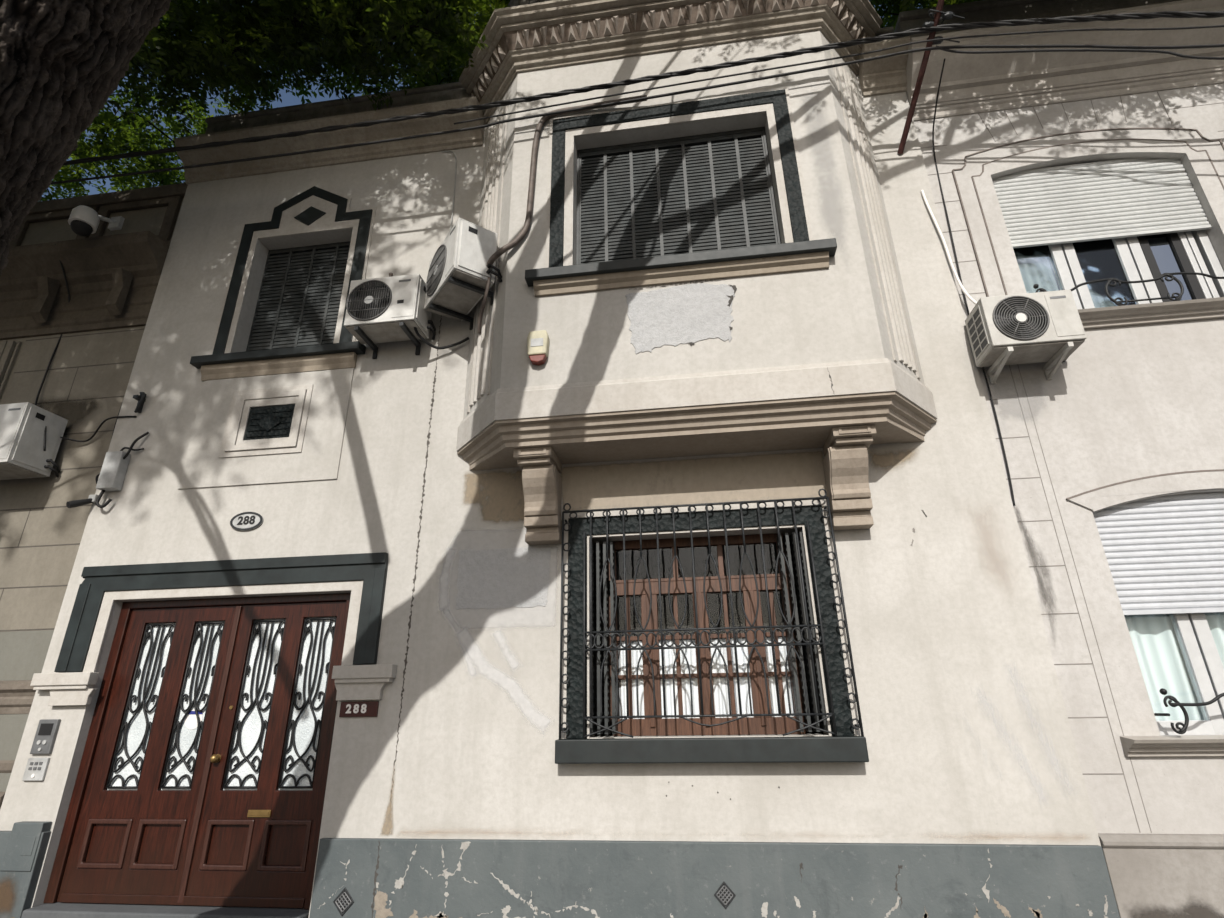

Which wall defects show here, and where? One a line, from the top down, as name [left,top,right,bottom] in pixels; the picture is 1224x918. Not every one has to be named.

crack [390,315,442,801]
spalling [374,882,393,918]
spalling [409,910,462,918]
peeling [761,902,780,918]
leakage [1132,904,1224,918]